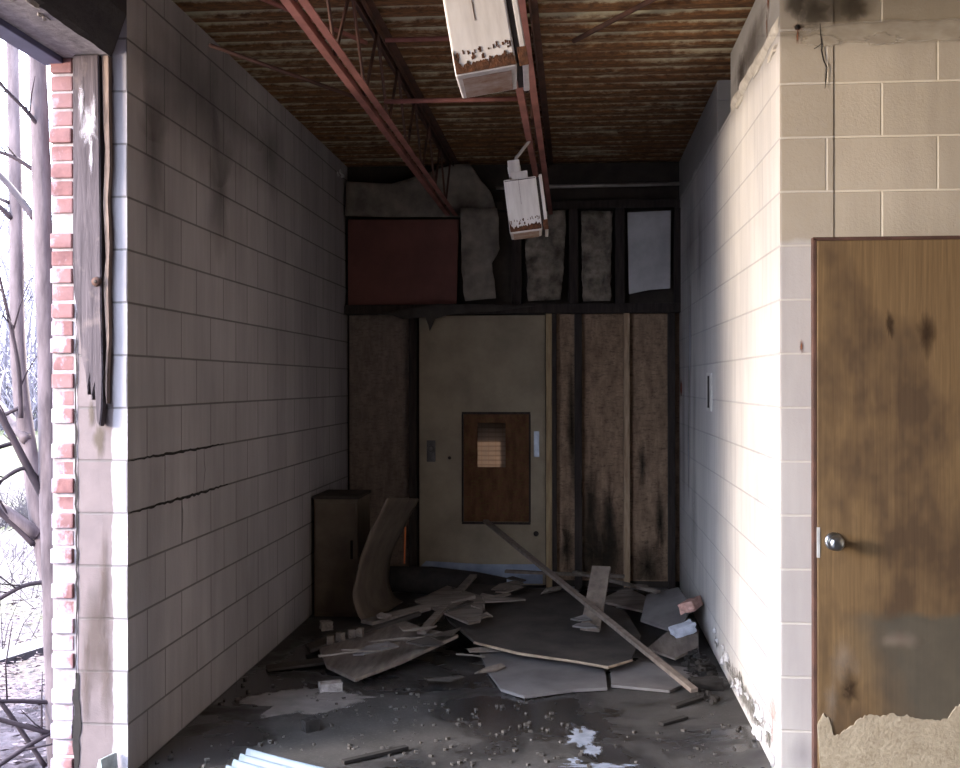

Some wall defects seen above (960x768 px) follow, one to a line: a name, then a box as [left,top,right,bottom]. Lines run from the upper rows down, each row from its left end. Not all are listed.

leakage [790,0,861,46]
crack [814,24,828,87]
leakage [90,407,103,449]
leakage [582,481,619,574]